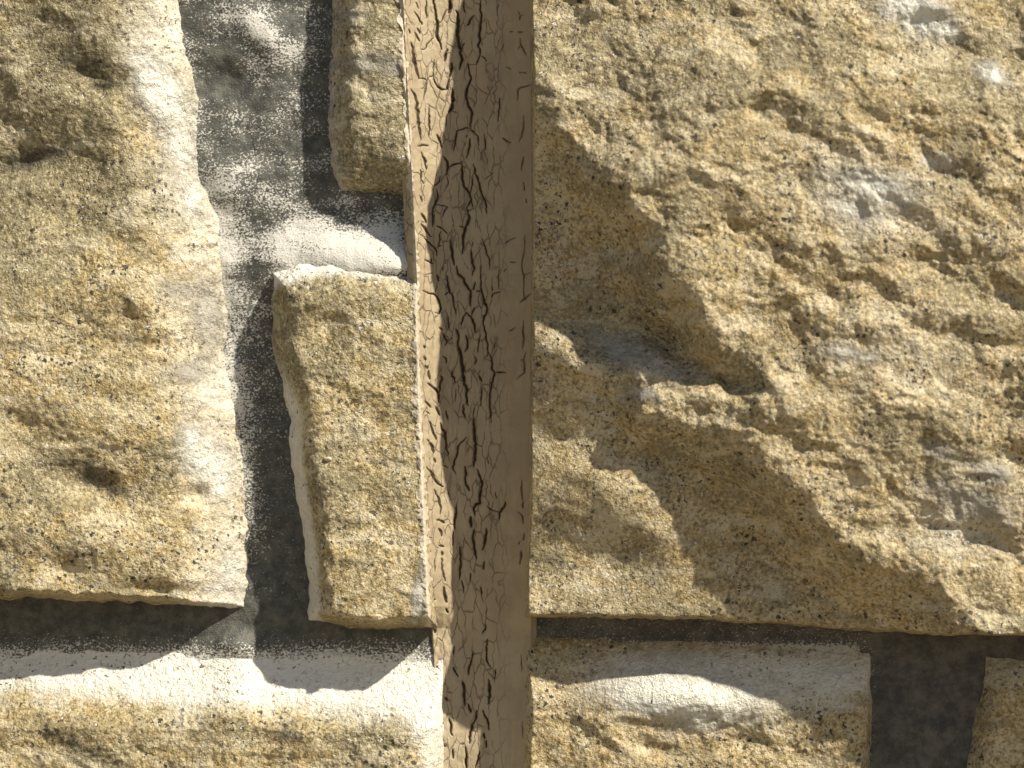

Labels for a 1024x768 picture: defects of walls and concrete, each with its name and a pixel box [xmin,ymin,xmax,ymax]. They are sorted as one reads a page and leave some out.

crack [408,0,531,768]